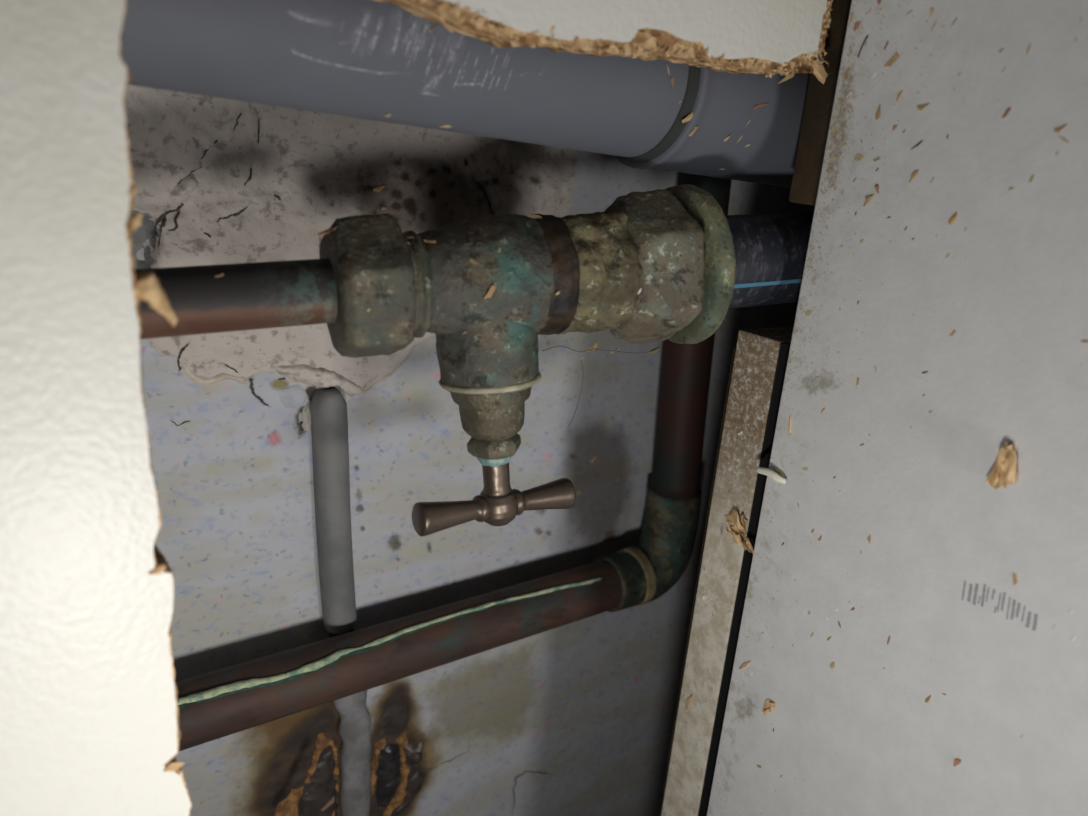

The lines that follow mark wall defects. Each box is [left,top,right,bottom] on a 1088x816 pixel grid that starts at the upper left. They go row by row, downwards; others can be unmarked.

crack [153,113,260,250]